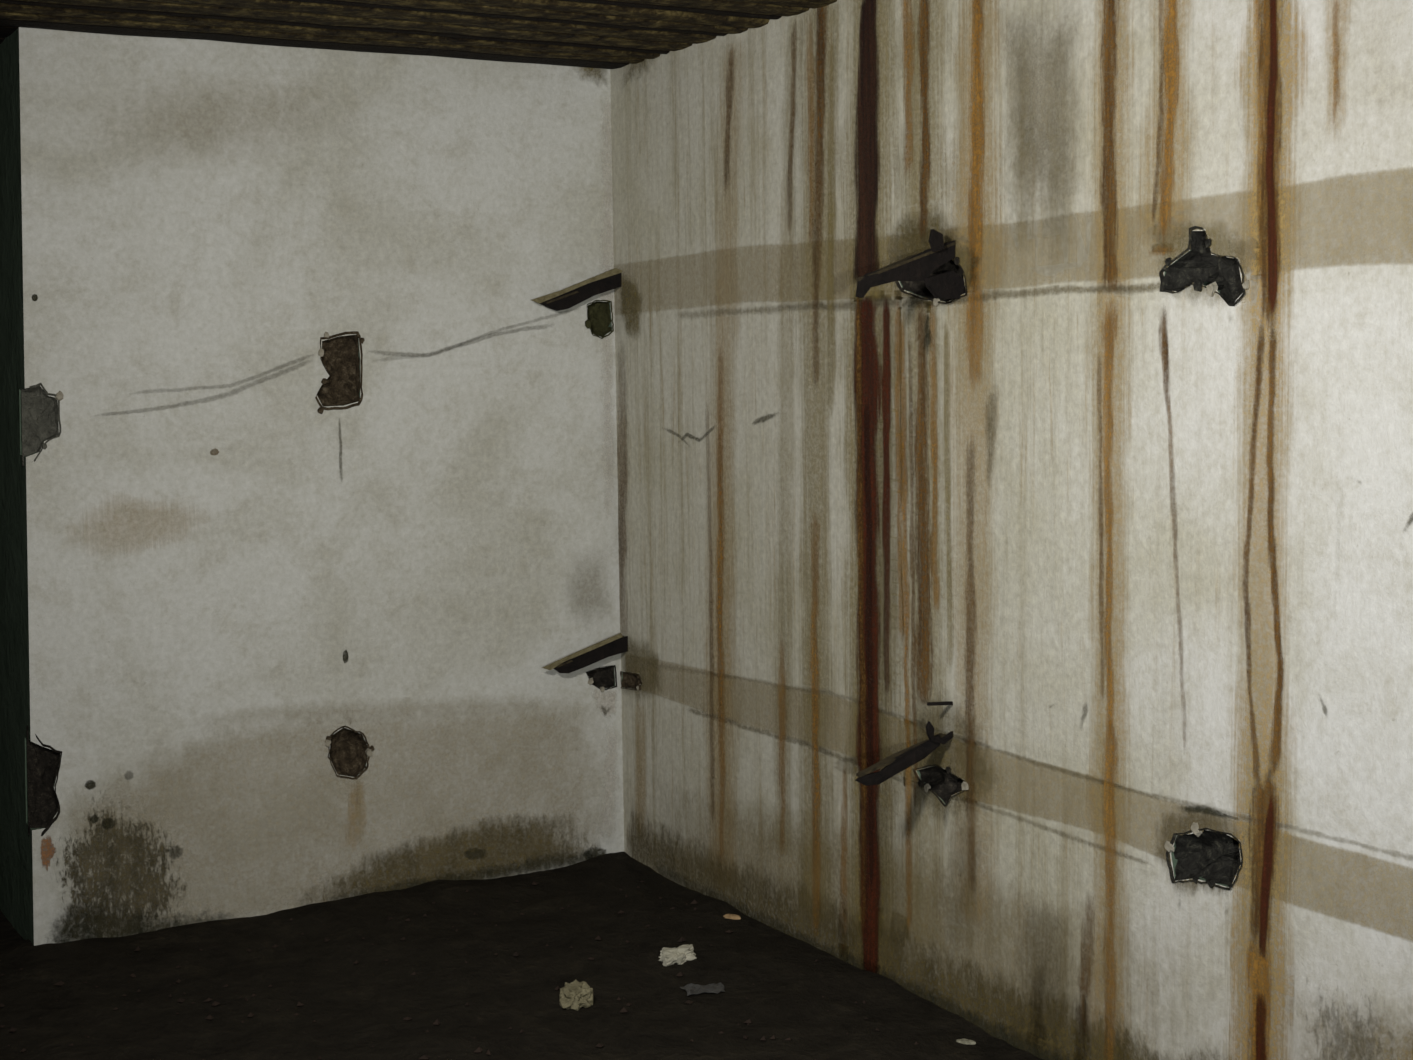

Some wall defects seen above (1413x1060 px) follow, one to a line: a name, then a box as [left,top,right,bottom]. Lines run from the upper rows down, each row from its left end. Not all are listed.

rust [956,0,992,370]
spalling [315,331,365,469]
rust [788,0,950,973]
rust [1079,0,1128,1060]
rust [1229,0,1303,1060]
spalling [27,726,62,869]
water stain [54,810,222,944]
spalling [324,726,374,780]
water stain [323,820,605,901]
water stain [630,819,1158,1060]
water stain [1159,806,1228,889]
spalling [1164,822,1243,890]